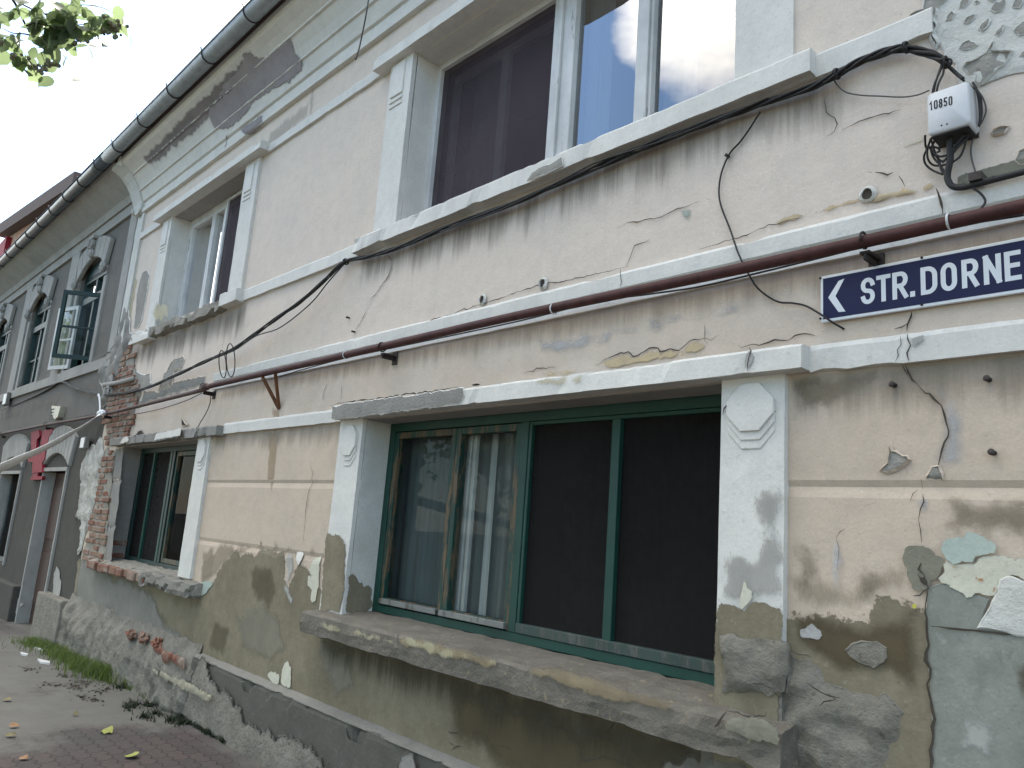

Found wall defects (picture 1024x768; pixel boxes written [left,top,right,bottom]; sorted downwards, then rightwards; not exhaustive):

spalling [208,38,303,135]
crack [824,96,898,136]
peeling [910,0,1024,87]
crack [430,198,710,321]
crack [701,218,796,249]
crack [597,333,815,370]
flaking render [76,345,206,570]
peeling [296,552,321,602]
water stain [74,533,754,768]
water stain [713,490,944,768]
crack [895,311,1011,768]
peeling [918,532,1024,637]